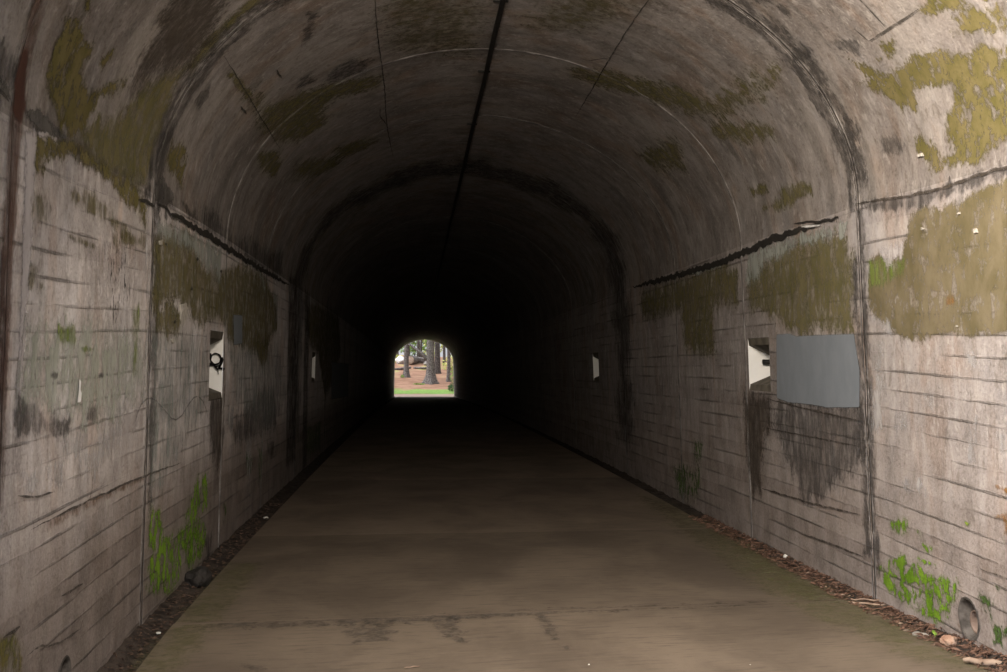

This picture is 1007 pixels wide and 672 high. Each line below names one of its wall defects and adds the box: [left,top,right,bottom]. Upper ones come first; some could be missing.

crack [139,199,289,285]
damp [14,0,635,487]
crack [633,160,1007,288]
damp [707,0,1004,556]